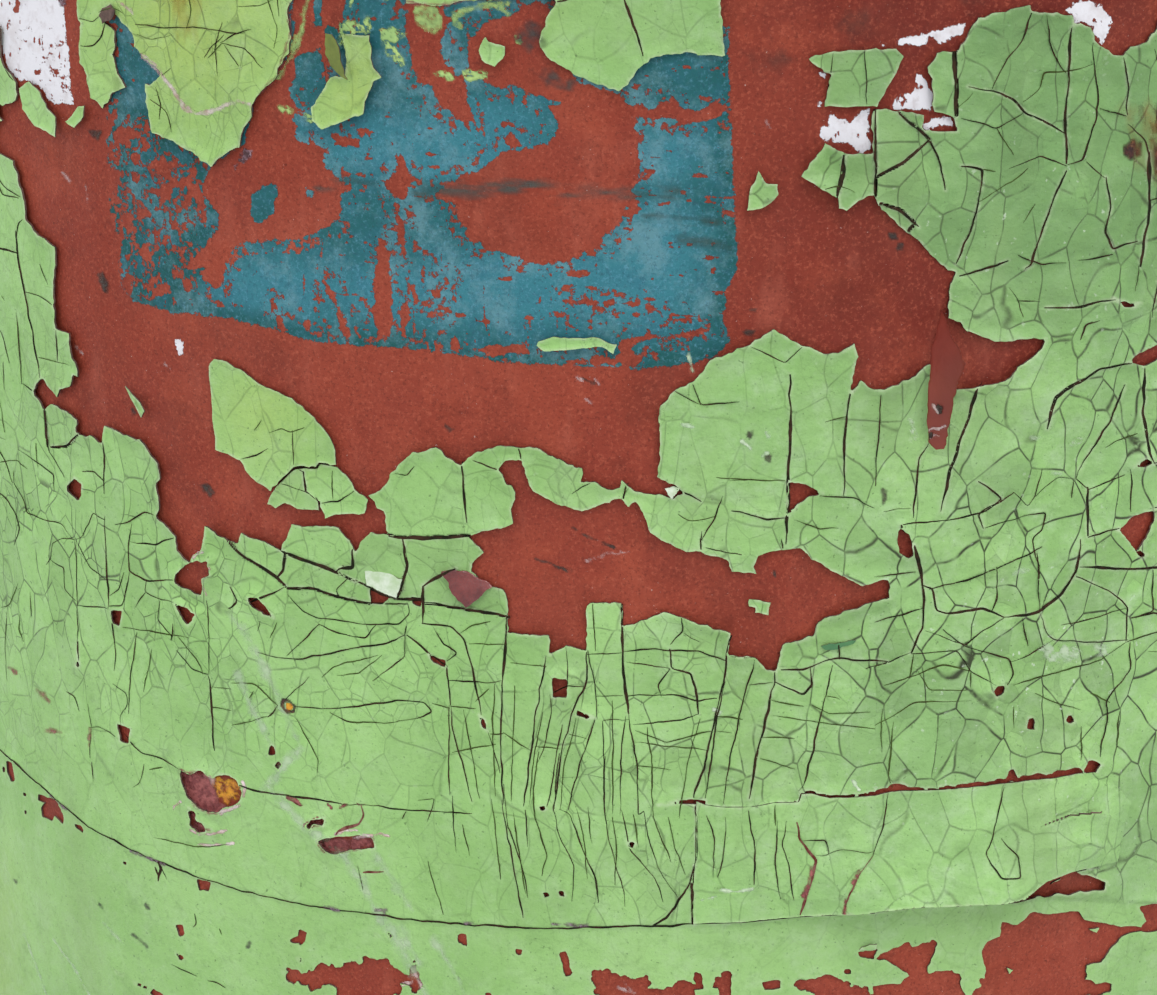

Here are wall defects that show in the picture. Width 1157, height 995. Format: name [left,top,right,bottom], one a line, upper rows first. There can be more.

corrosion [1123,140,1157,173]
crack [825,13,1157,340]
peeling [0,0,1157,670]
crack [0,181,1157,929]
corrosion [280,699,296,713]
corrosion [180,769,240,832]
peeling [1028,871,1104,898]
peeling [287,956,423,995]
spalling [560,951,572,975]
peeling [591,968,732,995]
spalling [762,980,780,989]
peeling [794,904,1157,995]